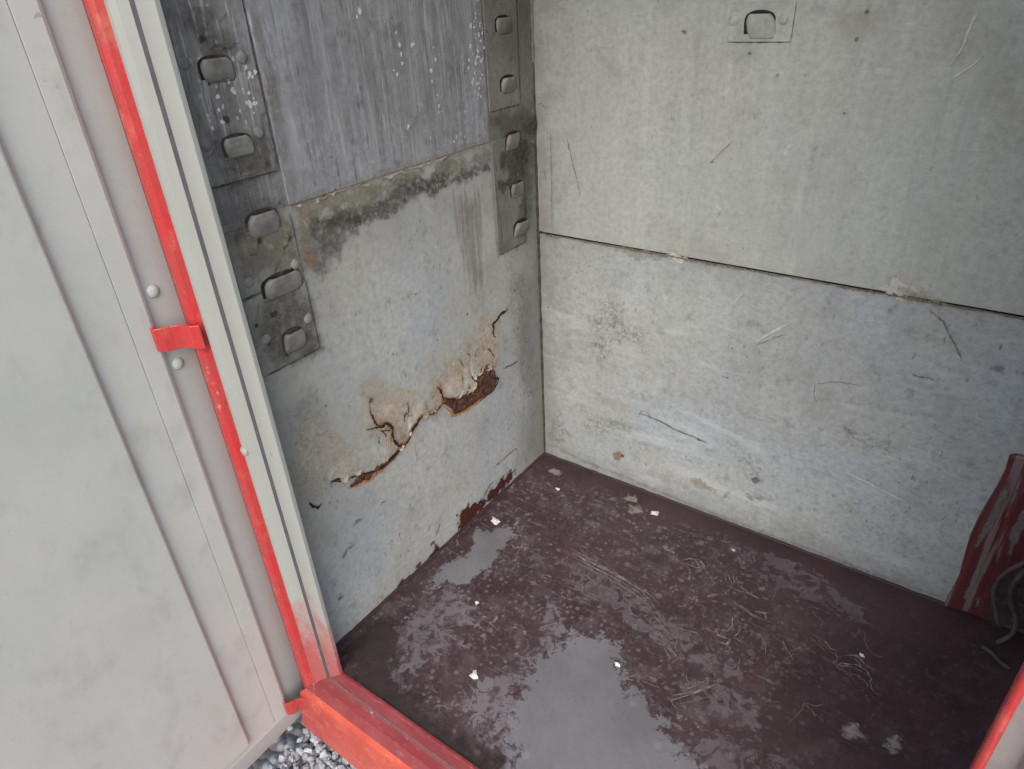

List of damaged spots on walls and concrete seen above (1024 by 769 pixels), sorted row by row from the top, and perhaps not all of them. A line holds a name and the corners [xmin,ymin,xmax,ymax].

damp [270,164,490,279]
corrosion [366,316,501,458]
spalling [441,363,499,417]
spalling [348,435,410,489]
damp [342,620,504,769]